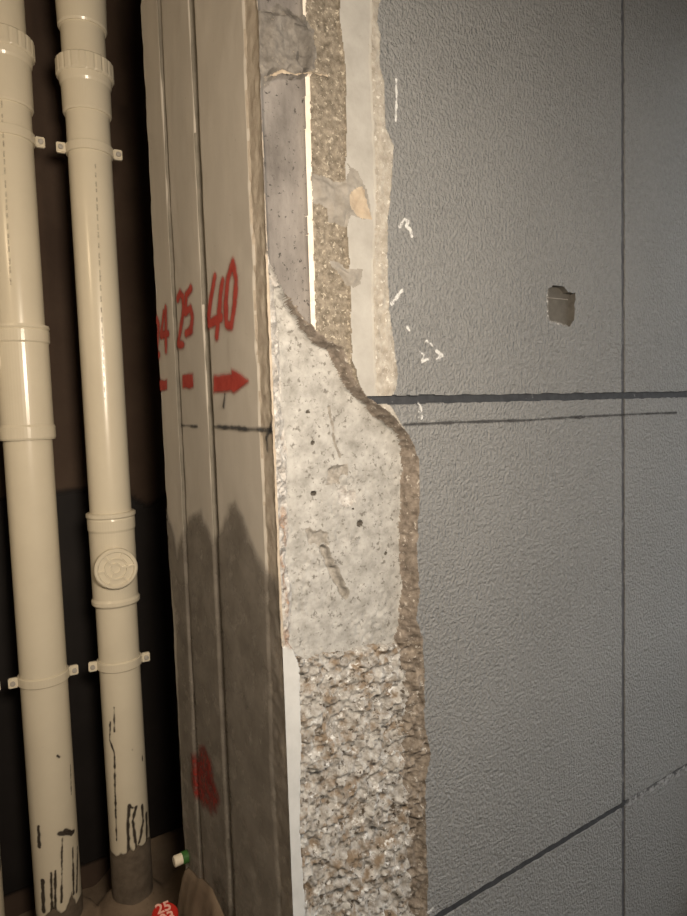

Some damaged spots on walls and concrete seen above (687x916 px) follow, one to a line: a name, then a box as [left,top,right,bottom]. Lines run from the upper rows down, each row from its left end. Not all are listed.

spalling [258,0,431,916]
spalling [546,285,576,327]